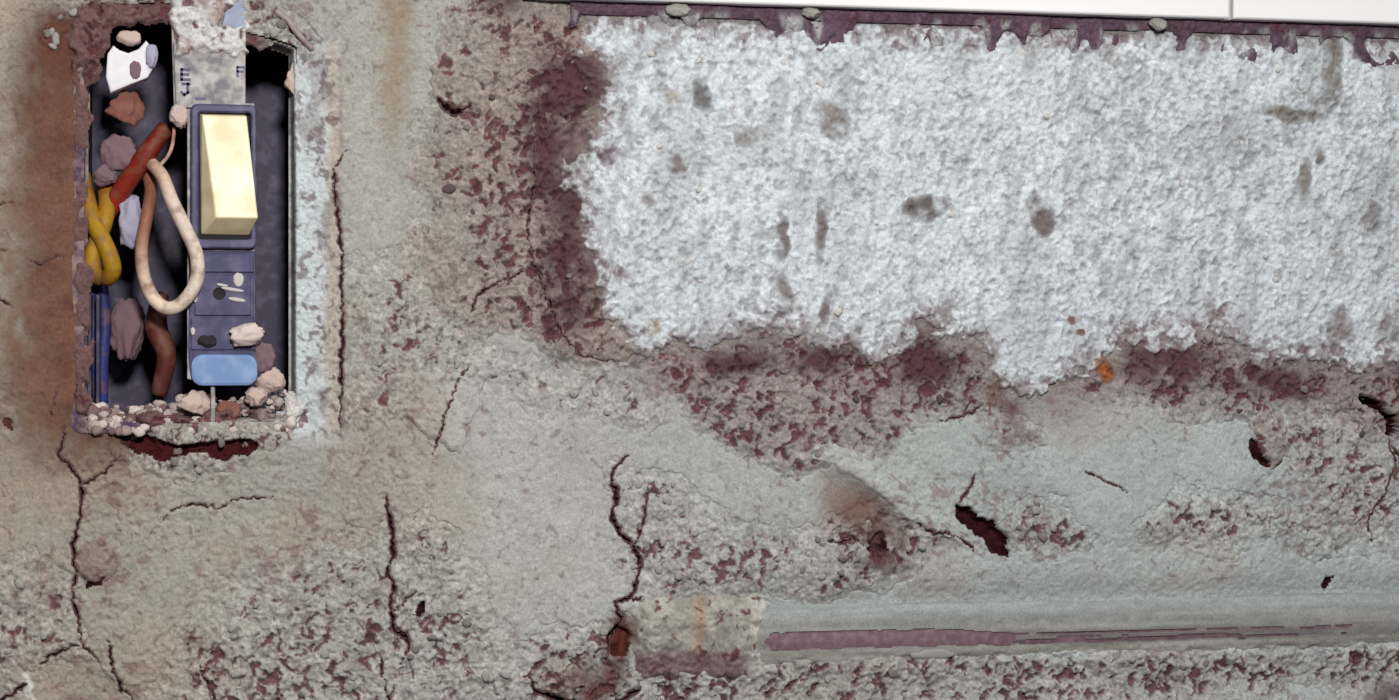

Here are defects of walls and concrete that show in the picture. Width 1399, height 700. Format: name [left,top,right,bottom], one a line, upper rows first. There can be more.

crack [0,249,65,266]
crack [331,150,348,428]
flaking render [329,0,1399,566]
crack [0,386,133,700]
spalling [72,421,295,487]
crack [161,495,274,523]
crack [379,496,417,700]
crack [604,455,649,660]
crack [1366,438,1399,542]
crack [199,665,216,700]
crack [527,675,573,700]
crack [616,686,642,700]